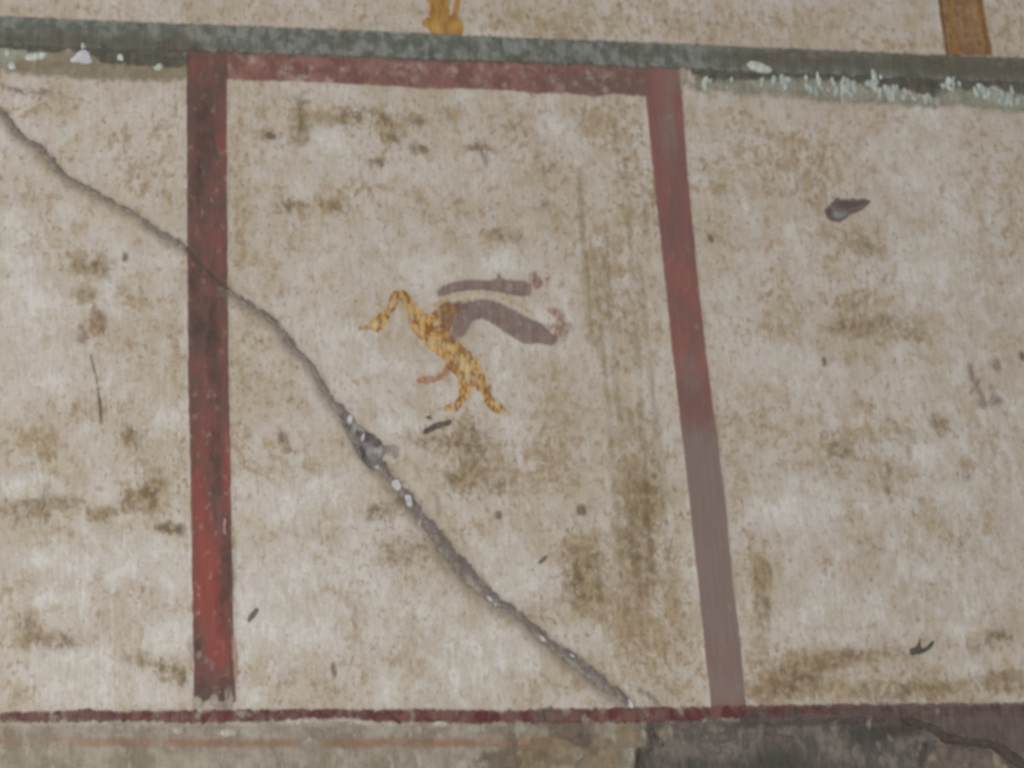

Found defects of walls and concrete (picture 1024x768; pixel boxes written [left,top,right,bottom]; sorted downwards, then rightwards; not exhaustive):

damp [690,61,1024,111]
crack [0,111,660,709]